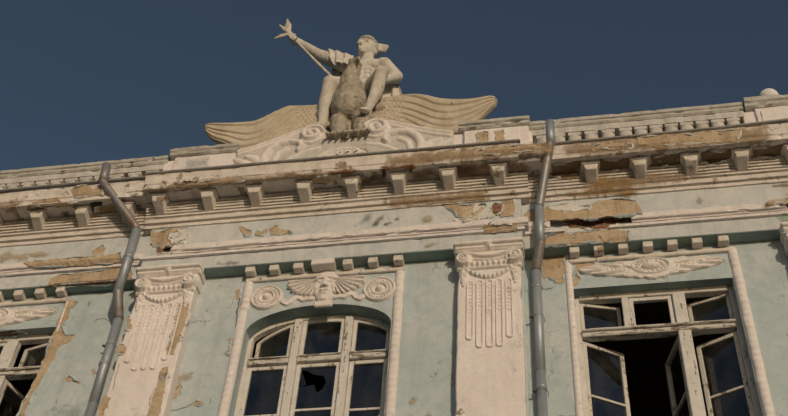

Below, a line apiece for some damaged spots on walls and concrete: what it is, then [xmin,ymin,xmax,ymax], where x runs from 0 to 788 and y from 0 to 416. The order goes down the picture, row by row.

peeling [382,129,554,177]
peeling [565,125,783,162]
flaking render [150,228,178,256]
peeling [240,224,293,238]
flaking render [391,175,683,286]
flaking render [24,244,135,288]
spalling [0,329,30,338]
flaking render [166,303,191,355]
peeling [16,300,78,416]
flaking render [96,395,111,416]
flaking render [147,366,186,416]